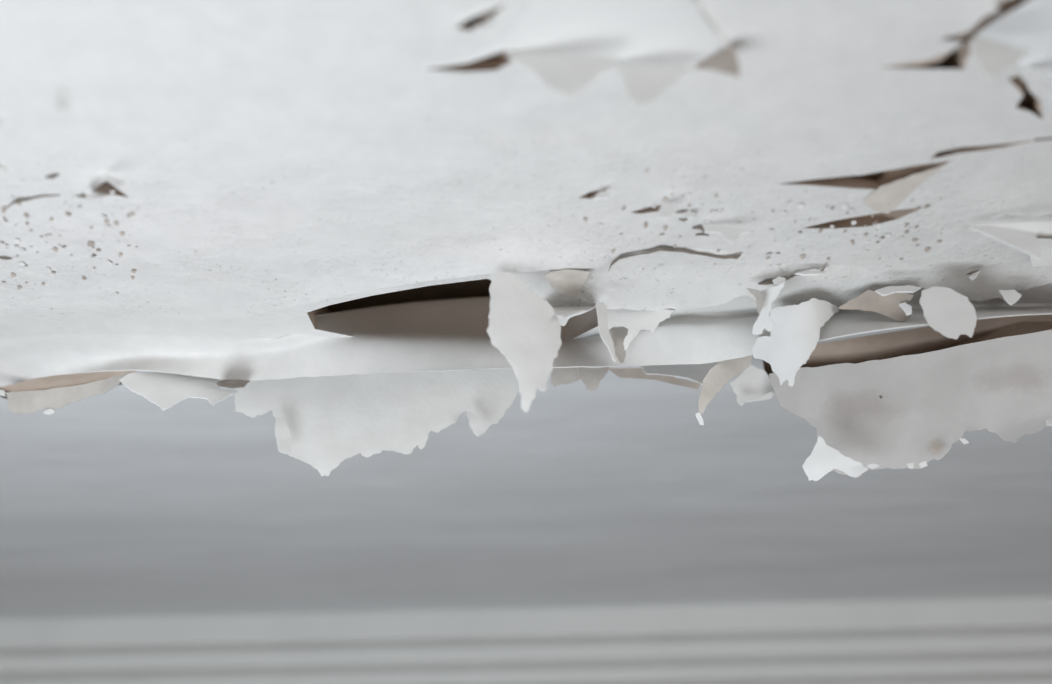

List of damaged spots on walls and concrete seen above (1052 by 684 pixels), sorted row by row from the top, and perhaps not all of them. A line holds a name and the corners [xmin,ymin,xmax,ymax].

peeling [420,0,742,107]
peeling [878,0,1052,120]
peeling [0,138,1052,481]